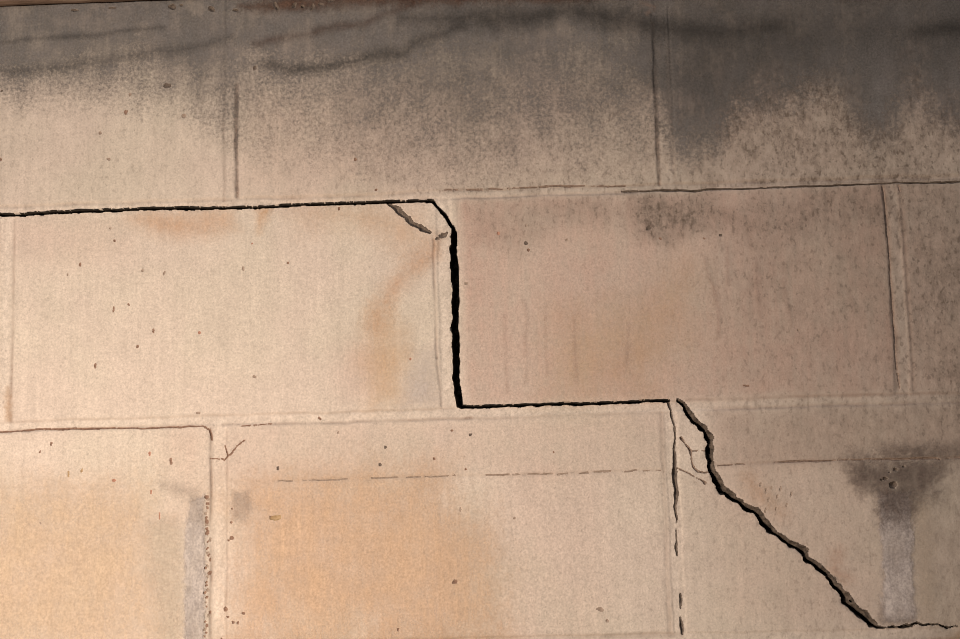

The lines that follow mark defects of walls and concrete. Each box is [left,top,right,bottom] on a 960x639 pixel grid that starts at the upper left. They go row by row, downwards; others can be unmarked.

crack [0,180,960,635]
leakage [850,450,940,520]